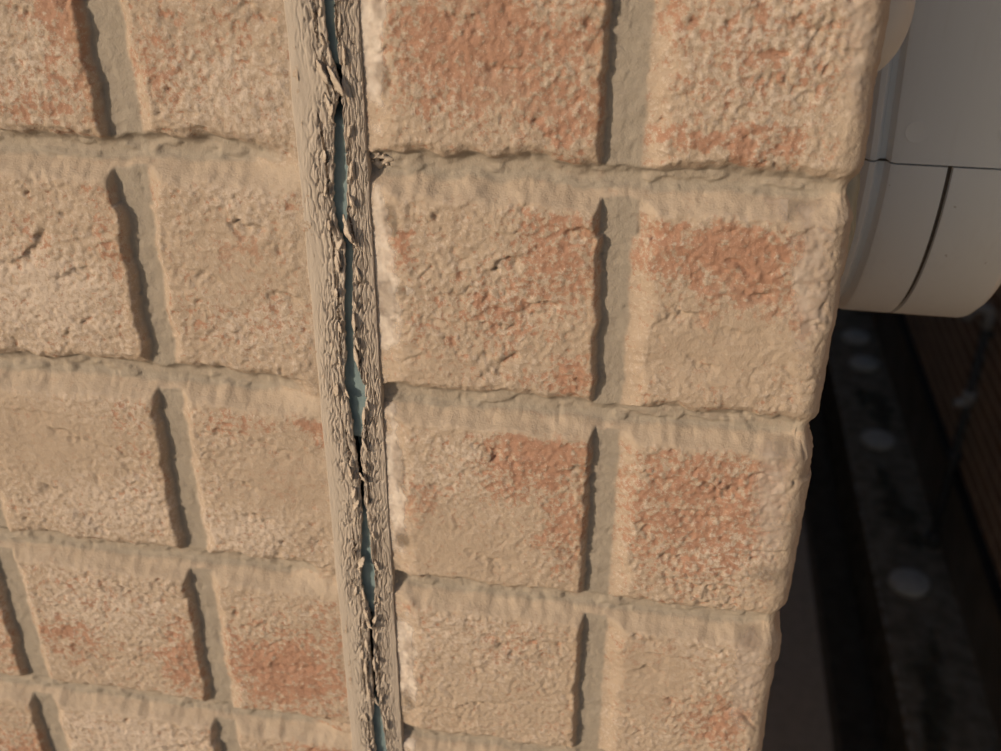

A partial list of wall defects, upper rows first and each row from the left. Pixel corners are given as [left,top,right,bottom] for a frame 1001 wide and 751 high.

crack [309,0,388,751]